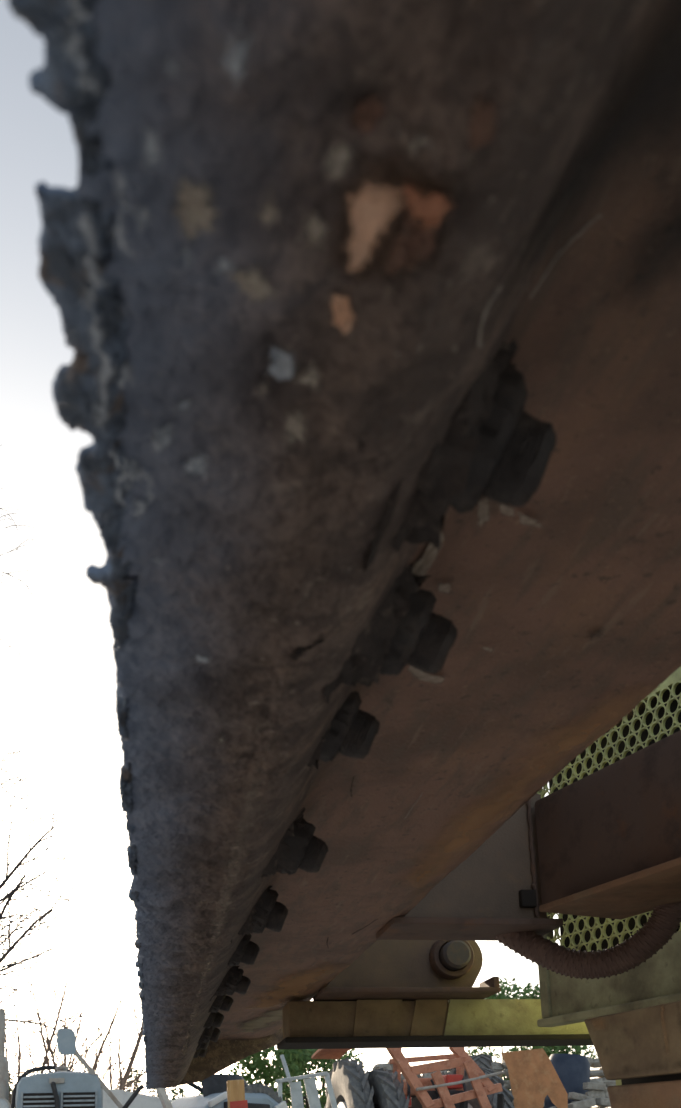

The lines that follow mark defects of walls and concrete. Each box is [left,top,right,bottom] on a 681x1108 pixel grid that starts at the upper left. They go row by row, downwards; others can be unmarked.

peeling [339,163,451,278]
peeling [330,294,355,335]